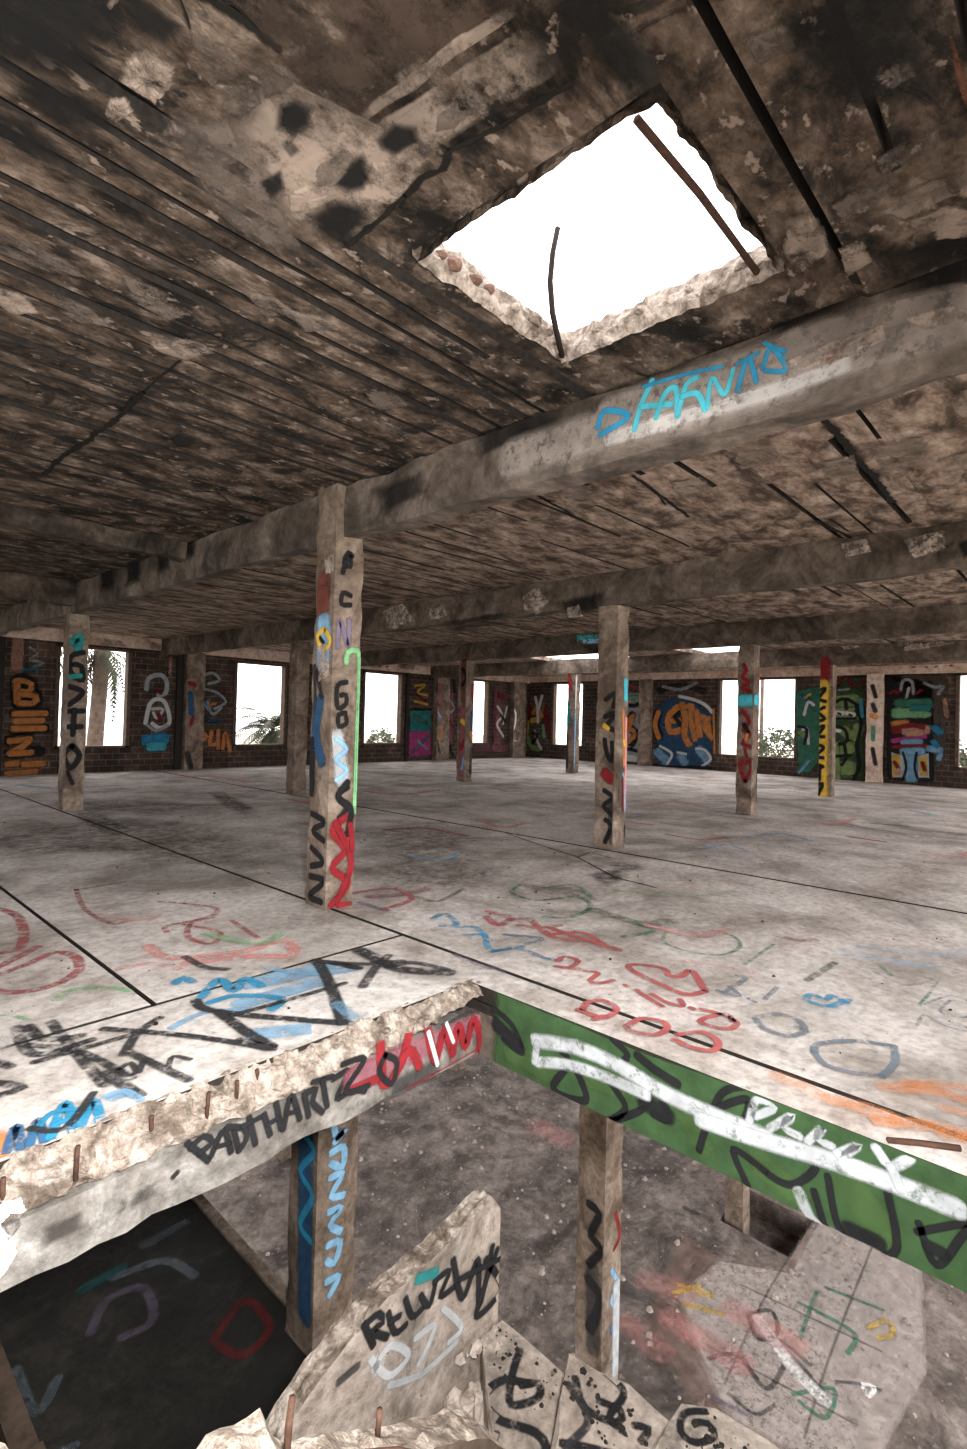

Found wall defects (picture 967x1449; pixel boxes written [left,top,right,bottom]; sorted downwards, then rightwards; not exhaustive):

crack [179,0,283,53]
flaking render [105,56,173,121]
water stain [263,173,283,195]
flaking render [831,130,967,240]
water stain [312,202,365,238]
spalling [412,82,872,364]
spalling [907,305,967,328]
spalling [784,325,886,377]
crack [42,360,182,475]
spalling [0,978,484,1278]
spalling [283,1394,296,1449]
spalling [366,1406,410,1449]